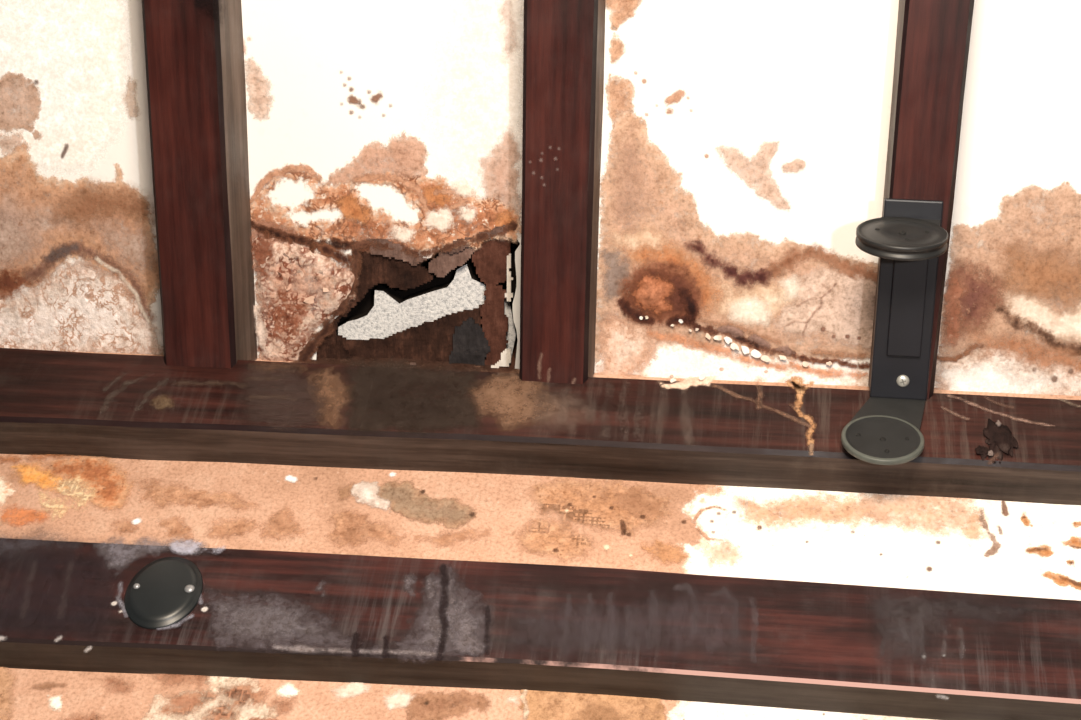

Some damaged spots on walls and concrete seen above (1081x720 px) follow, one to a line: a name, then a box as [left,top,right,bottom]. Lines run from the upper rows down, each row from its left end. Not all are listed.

leakage [0,0,164,355]
leakage [327,134,428,187]
corrosion [618,261,703,332]
leakage [595,0,878,387]
leakage [935,182,1081,396]